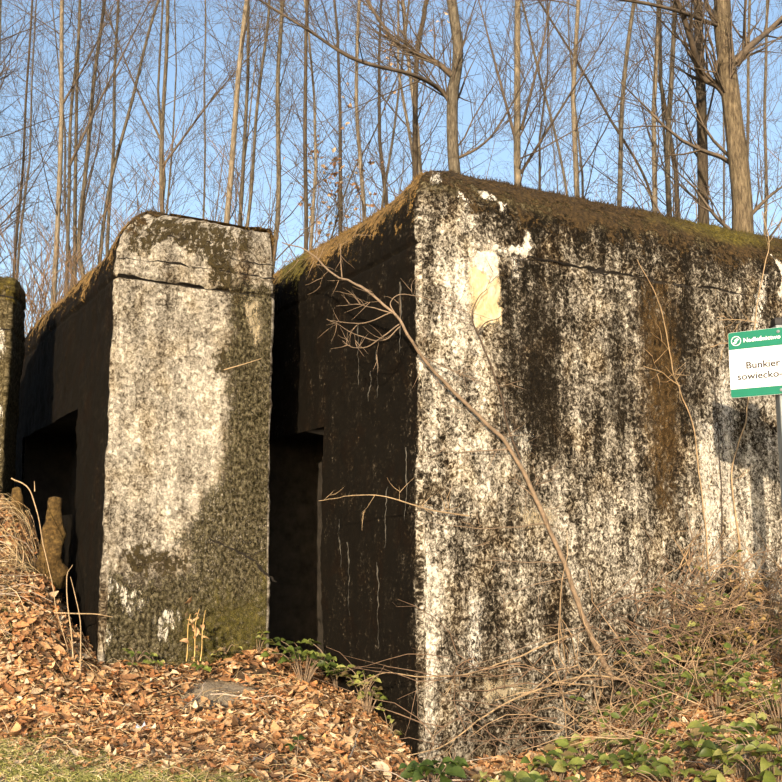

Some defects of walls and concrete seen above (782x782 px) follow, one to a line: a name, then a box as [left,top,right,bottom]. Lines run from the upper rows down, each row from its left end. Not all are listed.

leakage [105,277,272,673]
crack [117,257,275,298]
peeling [468,232,532,328]
leakage [499,271,558,459]
leakage [602,284,629,458]
crack [511,254,780,301]
leakage [677,287,750,580]
leakage [751,277,767,330]